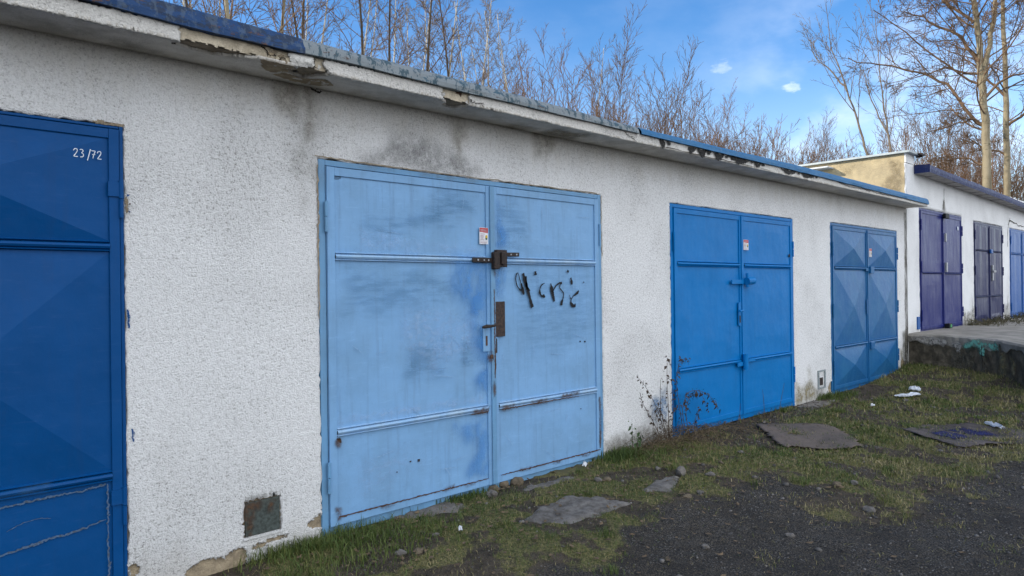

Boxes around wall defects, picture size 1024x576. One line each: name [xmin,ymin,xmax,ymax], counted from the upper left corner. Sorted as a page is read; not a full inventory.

spalling [171,27,335,86]
spalling [442,89,469,106]
peeling [688,147,765,167]
rust [502,392,579,410]
peeling [0,483,112,576]
rust [245,501,274,529]
rust [336,478,489,520]
peeling [184,532,289,576]